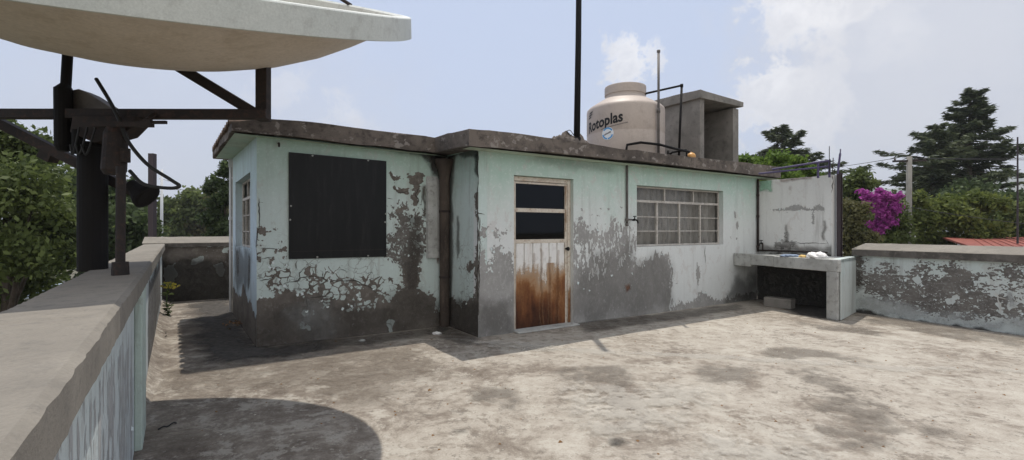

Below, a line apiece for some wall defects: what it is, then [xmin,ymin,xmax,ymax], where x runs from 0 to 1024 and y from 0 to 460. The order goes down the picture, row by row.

crack [255,202,382,309]
peeling [233,171,514,347]
rust [516,263,571,329]
peeling [574,206,757,324]
peeling [770,204,824,224]
peeling [854,256,1024,324]